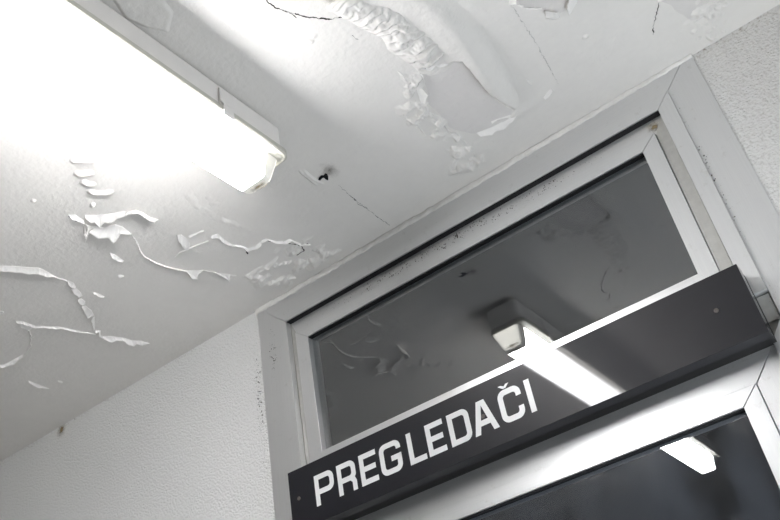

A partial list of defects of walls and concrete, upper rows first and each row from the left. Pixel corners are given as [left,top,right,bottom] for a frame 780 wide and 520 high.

crack [266,0,342,20]
peeling [509,0,577,20]
flaking render [395,62,516,176]
peeling [68,210,343,290]
peeling [0,266,149,368]